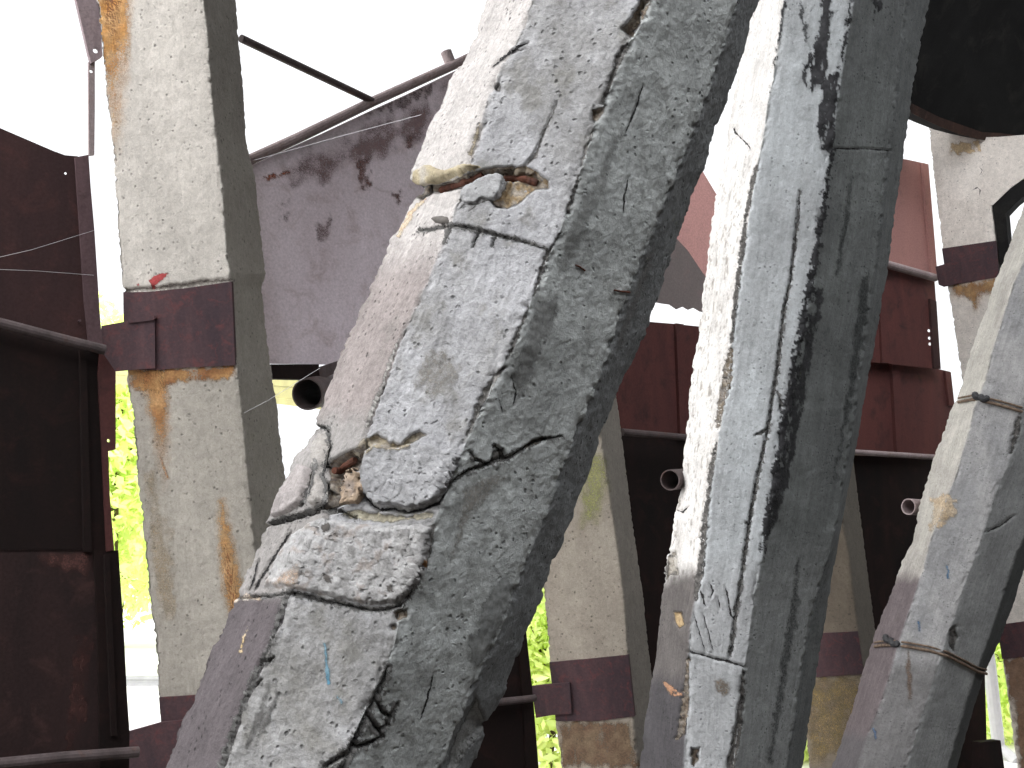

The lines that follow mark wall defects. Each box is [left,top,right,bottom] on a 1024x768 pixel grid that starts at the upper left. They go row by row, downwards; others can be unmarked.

rust [98,0,129,116]
water stain [773,1,787,68]
water stain [799,0,852,91]
spalling [412,123,548,208]
crack [416,199,548,251]
rust [128,365,235,478]
spalling [270,338,461,568]
crack [688,190,802,667]
water stain [769,288,824,532]
water stain [836,276,868,464]
rust [218,500,242,610]
crack [217,424,565,768]